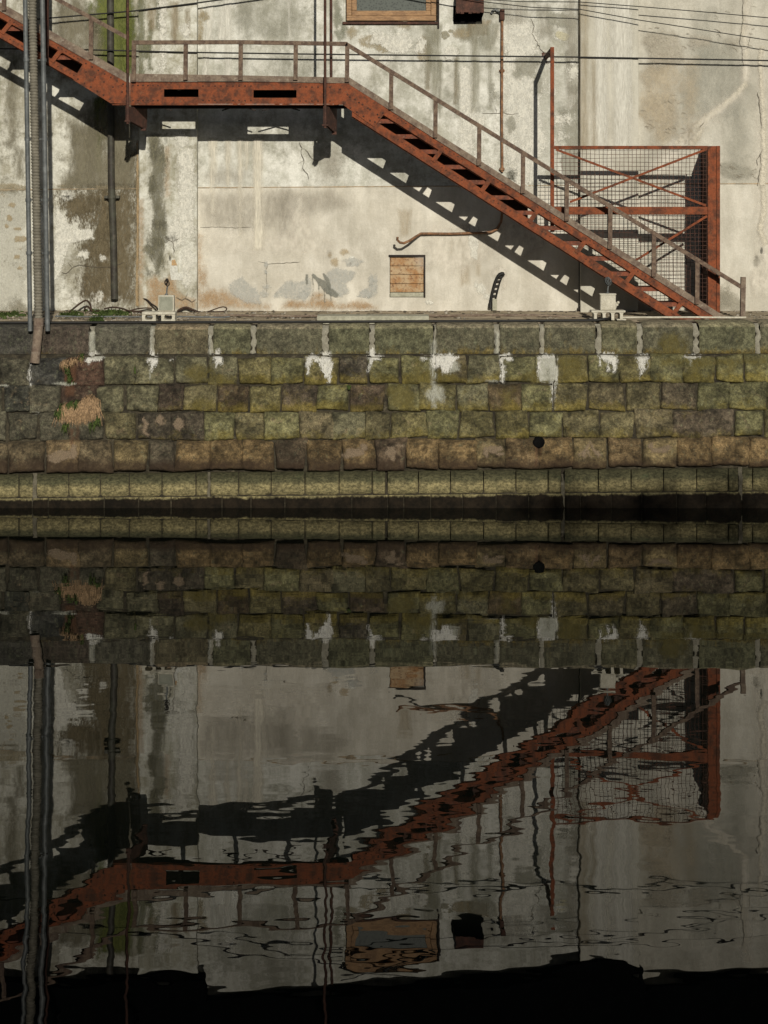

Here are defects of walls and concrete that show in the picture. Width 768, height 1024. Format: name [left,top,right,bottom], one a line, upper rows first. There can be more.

water stain [58,0,160,75]
water stain [7,60,24,175]
water stain [53,96,173,309]
spalling [228,256,377,304]
efflorescence [305,351,334,384]
water stain [388,341,459,409]
efflorescence [493,333,513,381]
efflorescence [537,353,559,408]
efflorescence [599,352,618,372]
water stain [634,350,657,375]